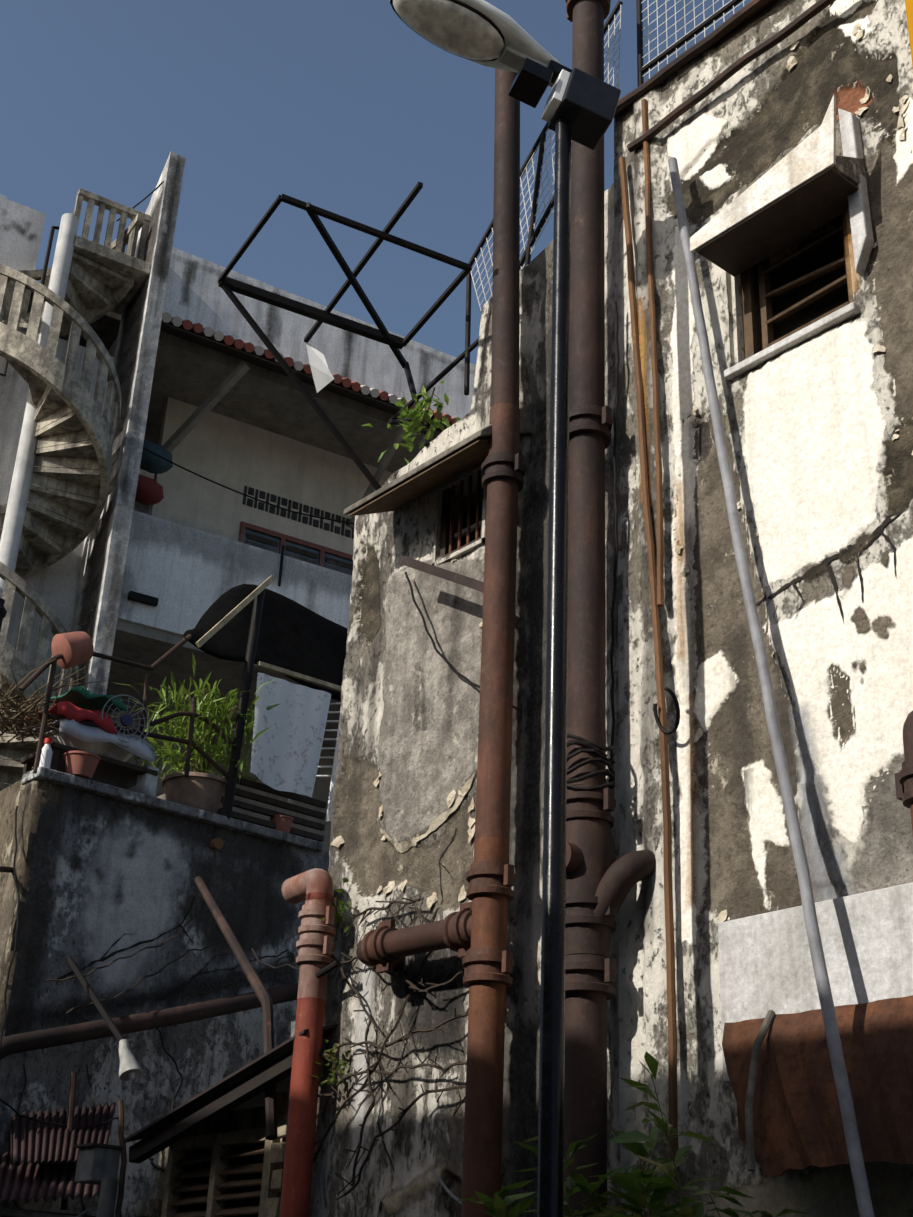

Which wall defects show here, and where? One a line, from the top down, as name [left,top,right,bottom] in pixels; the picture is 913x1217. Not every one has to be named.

damp [184,263,195,301]
damp [343,331,353,378]
peeling [653,0,913,945]
flaking render [355,540,381,648]
crack [756,512,903,624]
flaking render [331,756,475,910]
damp [5,779,302,1037]